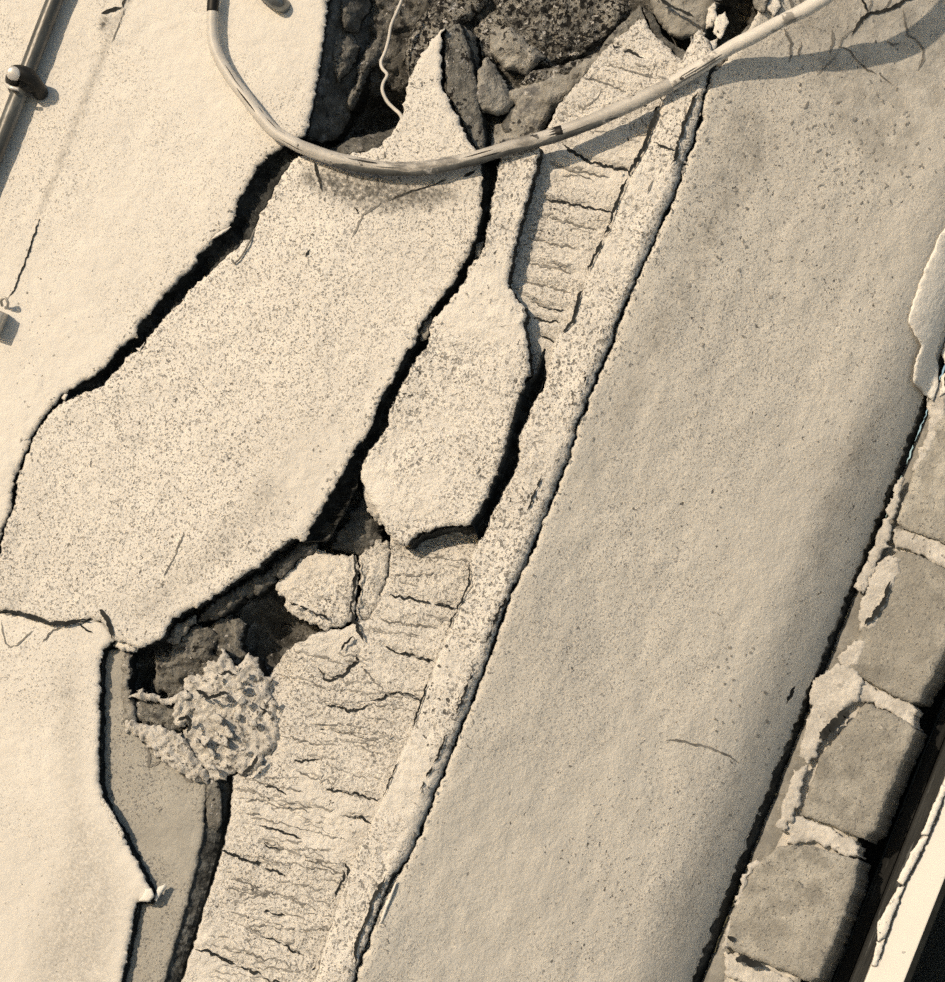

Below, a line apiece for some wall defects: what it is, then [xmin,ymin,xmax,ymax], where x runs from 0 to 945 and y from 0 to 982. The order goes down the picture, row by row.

crack [101,0,126,39]
spalling [306,0,782,155]
crack [817,0,925,82]
crack [0,146,322,579]
crack [305,151,504,542]
spalling [511,95,666,391]
peeling [908,228,945,401]
crack [348,75,726,982]
crack [0,609,114,648]
spalling [98,481,479,982]
spalling [819,710,850,740]
peeling [871,784,945,966]